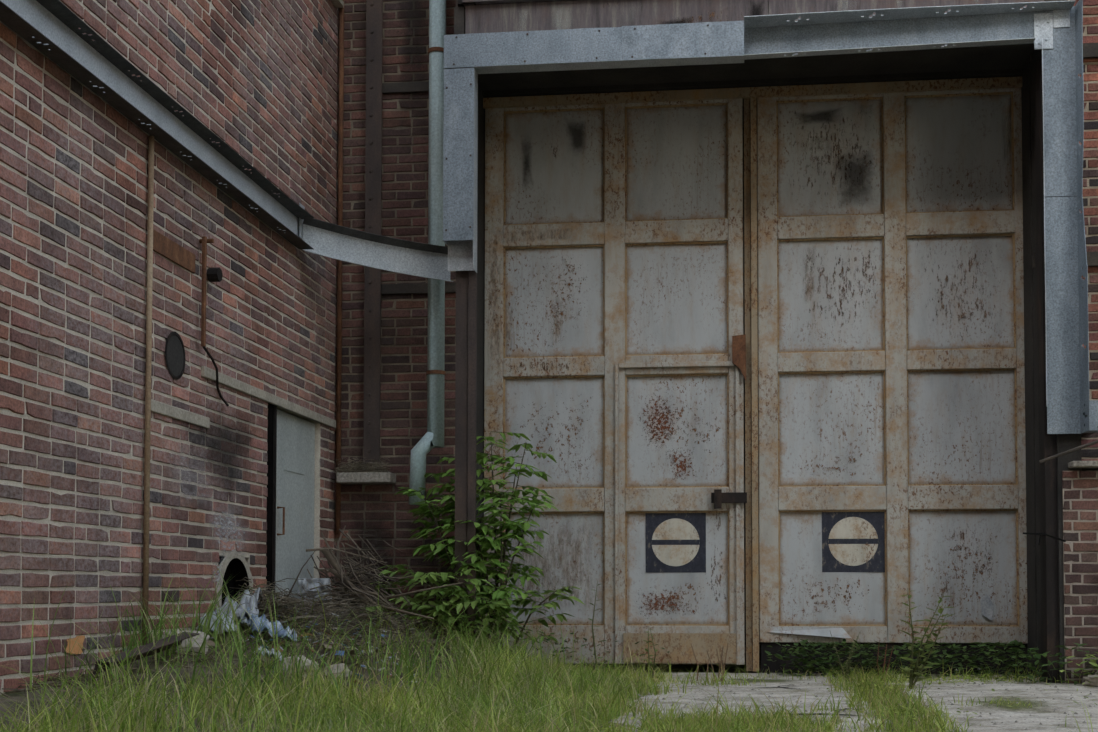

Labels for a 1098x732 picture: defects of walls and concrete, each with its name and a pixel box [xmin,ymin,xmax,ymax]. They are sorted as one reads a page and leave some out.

corrosion [805,251,876,338]
corrosion [639,395,720,482]
corrosion [638,547,726,619]